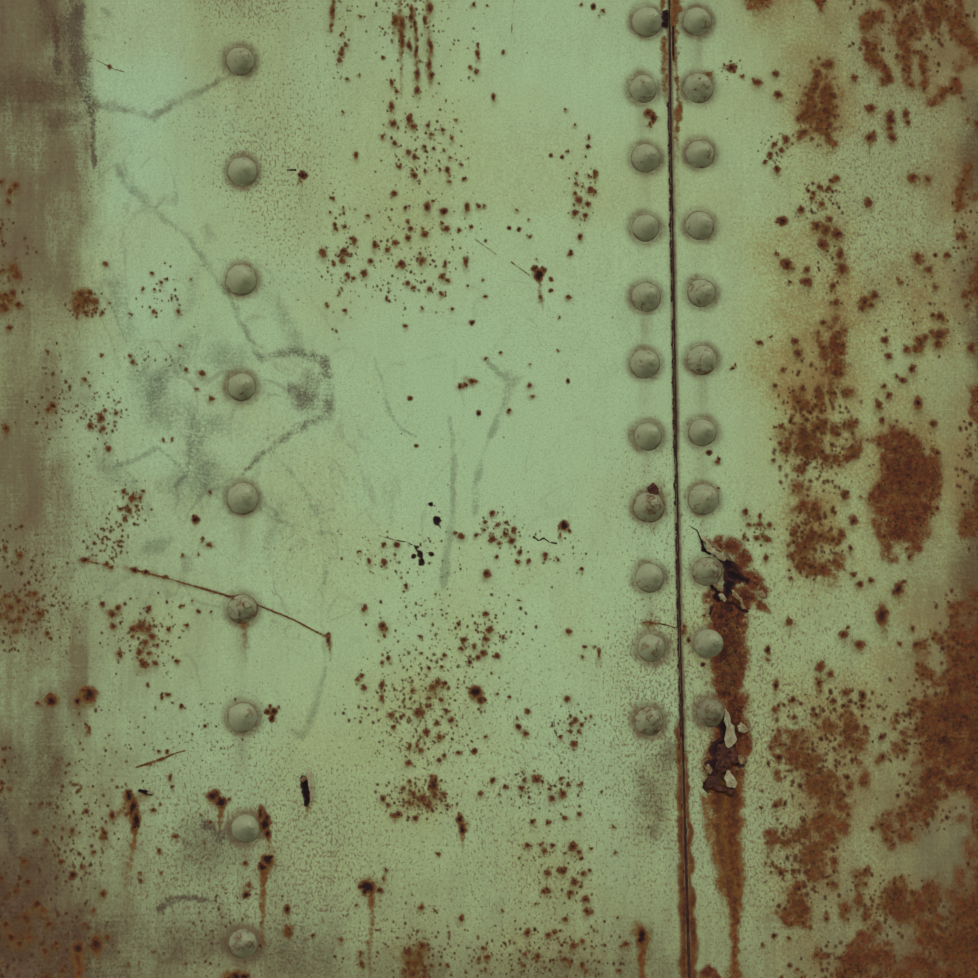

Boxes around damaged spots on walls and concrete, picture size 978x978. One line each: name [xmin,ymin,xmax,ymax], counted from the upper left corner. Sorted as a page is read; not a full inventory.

corrosion [848,0,978,106]
corrosion [318,0,497,328]
corrosion [66,488,153,569]
spalling [691,527,766,615]
corrosion [674,164,978,978]
corrosion [99,592,213,675]
corrosion [335,506,598,841]
corrosion [0,686,180,978]
corrosion [199,789,231,829]
peeling [300,769,314,811]
peeling [703,708,749,797]
corrosion [339,838,648,978]